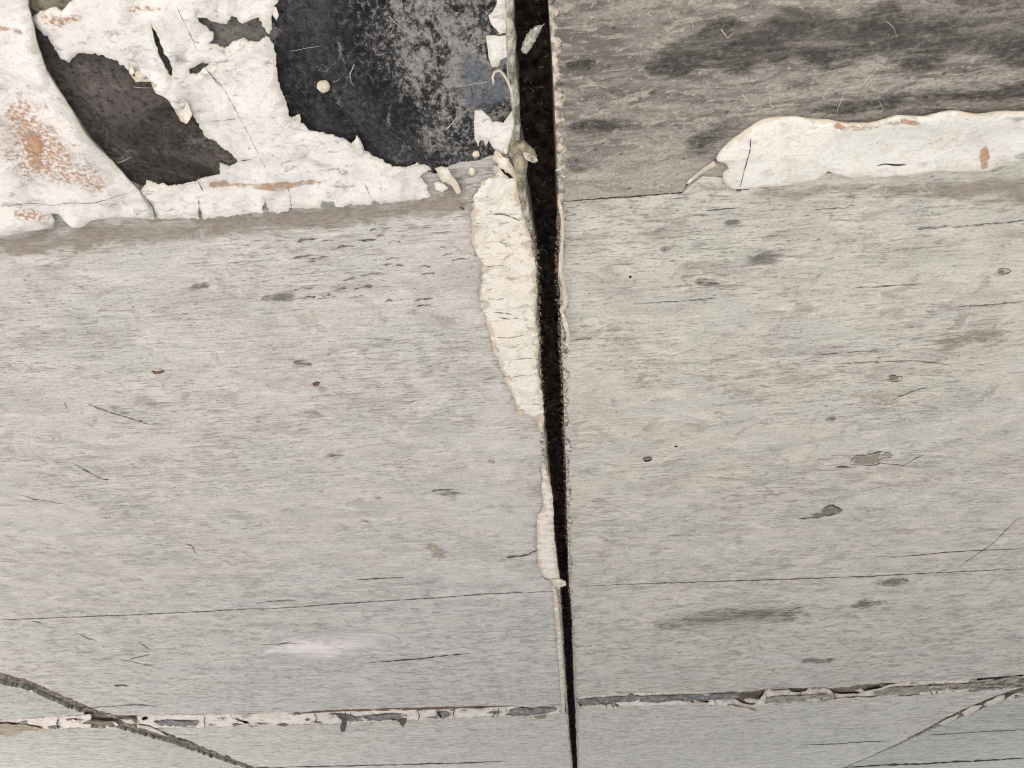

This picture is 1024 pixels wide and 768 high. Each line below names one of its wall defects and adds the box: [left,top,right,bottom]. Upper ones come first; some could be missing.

leakage [566,60,594,70]
leakage [646,4,985,77]
leakage [979,31,1024,67]
rust [6,101,101,190]
leakage [572,120,618,131]
leakage [687,126,727,153]
peeling [716,110,1024,192]
leakage [813,85,1024,129]
peeling [0,0,582,768]